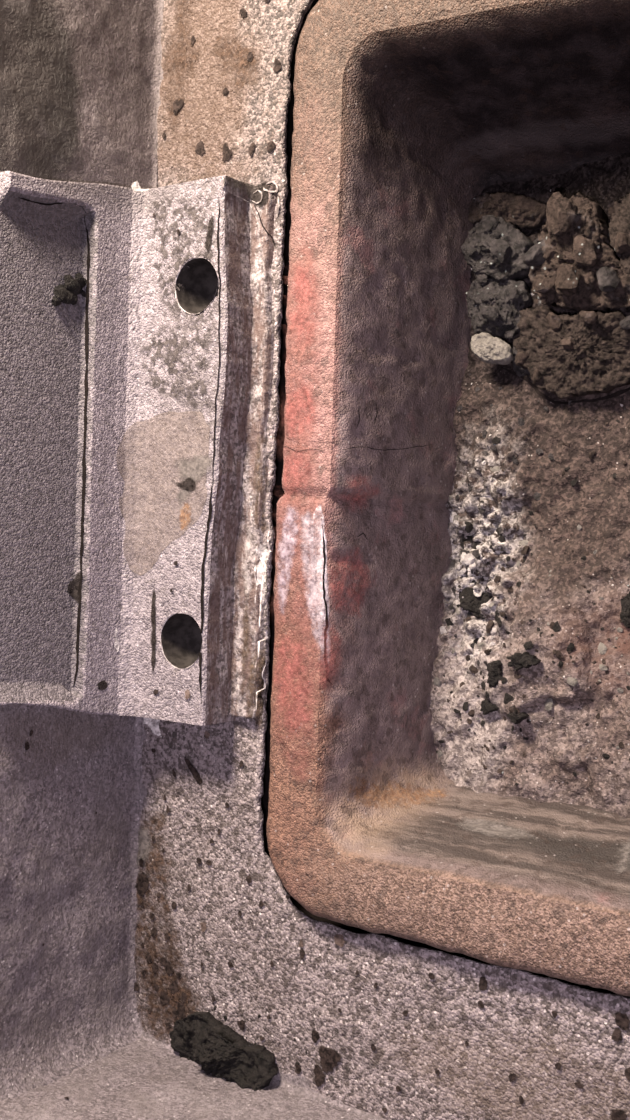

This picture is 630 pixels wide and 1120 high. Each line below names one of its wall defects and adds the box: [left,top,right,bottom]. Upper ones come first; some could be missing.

crack [284,404,427,452]
crack [321,518,332,684]